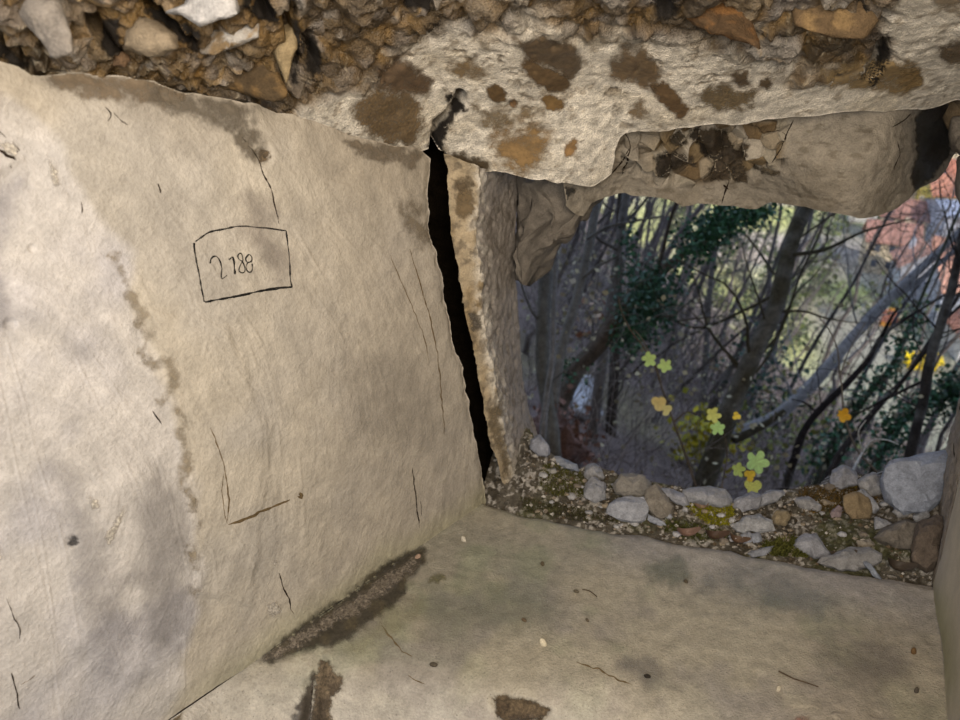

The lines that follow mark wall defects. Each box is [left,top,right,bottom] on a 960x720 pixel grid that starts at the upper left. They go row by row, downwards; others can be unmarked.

leakage [450,62,485,78]
leakage [512,36,581,79]
leakage [610,42,689,120]
leakage [472,84,530,128]
leakage [349,140,421,170]
leakage [451,151,489,170]
crack [391,136,493,485]
spalling [311,660,343,720]
spalling [493,695,550,720]